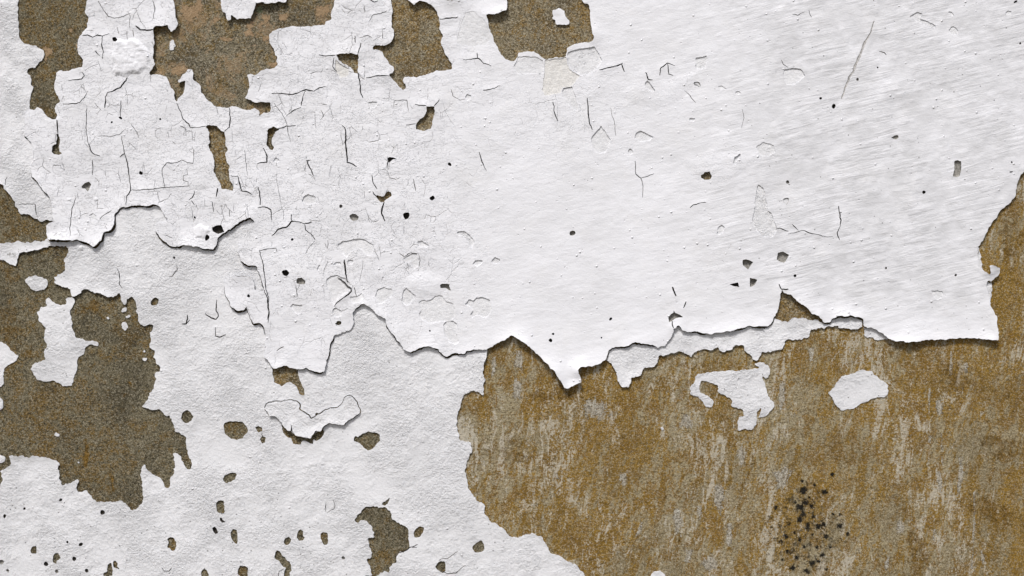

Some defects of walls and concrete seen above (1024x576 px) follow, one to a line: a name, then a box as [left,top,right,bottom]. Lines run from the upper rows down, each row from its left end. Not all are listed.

peeling [18,0,89,119]
crack [56,1,357,322]
peeling [150,0,334,116]
crack [272,0,389,221]
peeling [373,0,452,90]
crack [394,54,500,125]
peeling [452,0,602,106]
peeling [0,184,192,515]
crack [182,300,226,338]
peeling [263,160,1024,576]
leakage [928,388,943,415]
leakage [761,467,849,574]